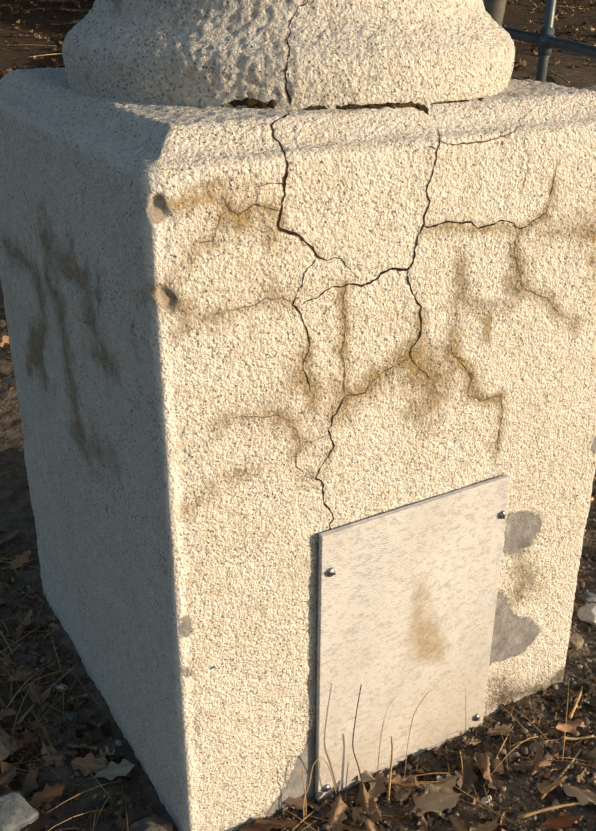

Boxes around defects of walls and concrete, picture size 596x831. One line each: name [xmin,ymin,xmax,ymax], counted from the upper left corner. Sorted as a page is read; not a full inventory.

spalling [148,195,166,223]
crack [199,0,559,530]
water stain [512,237,530,293]